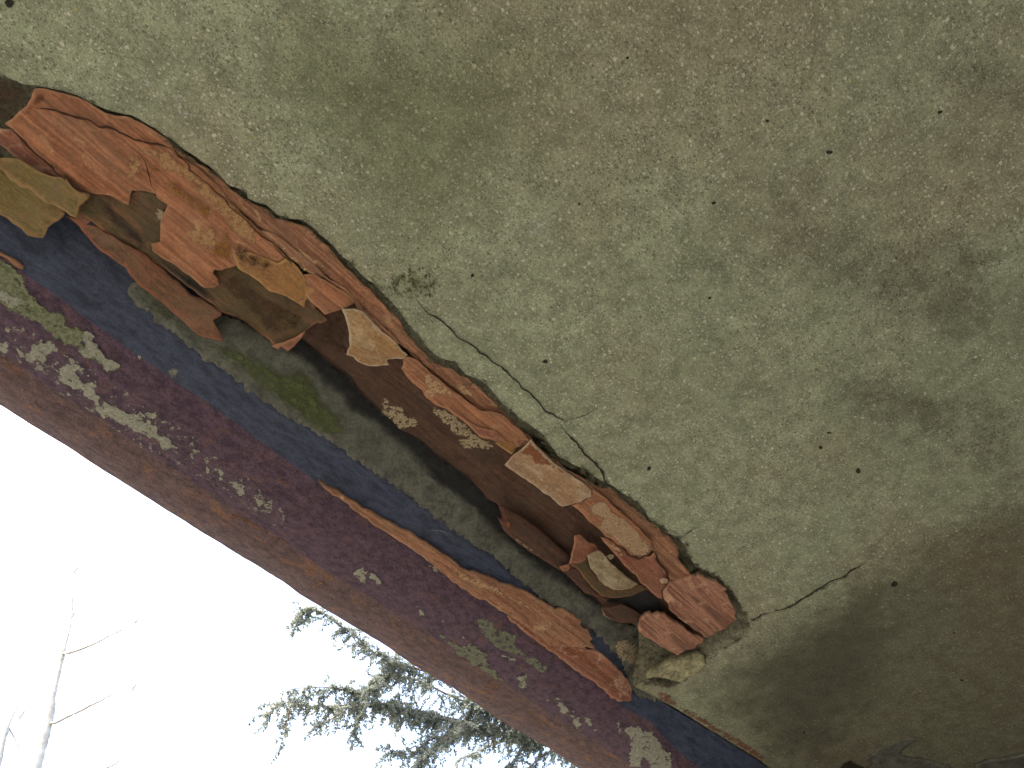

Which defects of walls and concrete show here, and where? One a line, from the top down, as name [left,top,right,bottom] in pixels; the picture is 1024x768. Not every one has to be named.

spalling [0,76,751,686]
crack [409,292,610,487]
crack [751,529,898,622]